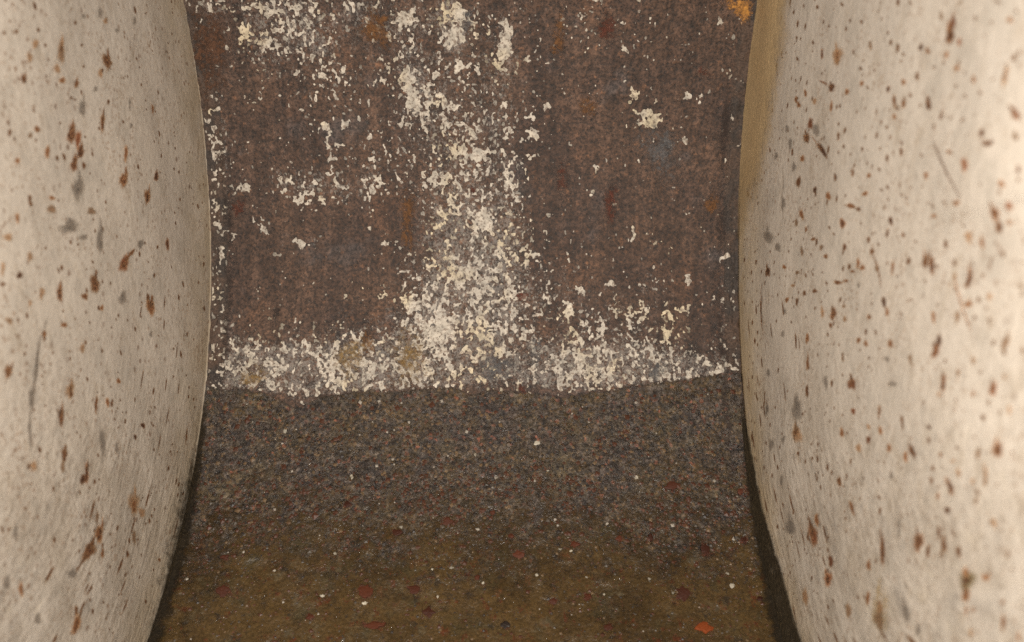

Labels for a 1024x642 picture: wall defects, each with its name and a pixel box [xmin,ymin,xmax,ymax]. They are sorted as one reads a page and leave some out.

rust [3,0,84,100]
rust [727,0,751,24]
rust [28,121,102,181]
rust [989,164,1020,233]
rust [57,239,169,327]
rust [111,293,165,336]
rust [743,0,1011,497]
rust [34,340,103,427]
rust [72,454,155,634]
rust [759,490,885,586]
rust [914,424,1013,616]
rust [817,581,887,642]